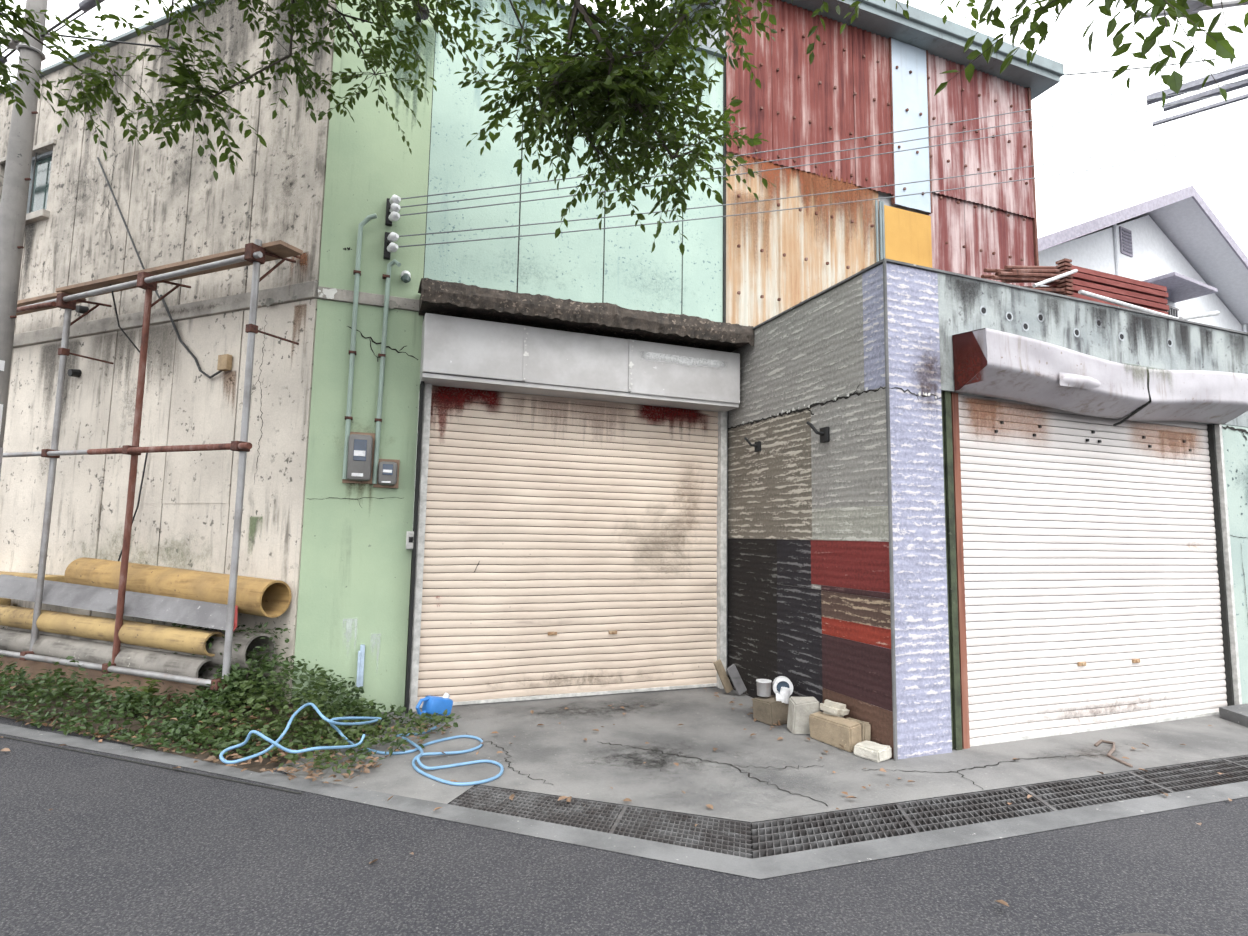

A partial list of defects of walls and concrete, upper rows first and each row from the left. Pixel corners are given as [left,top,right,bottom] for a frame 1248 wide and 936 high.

rust [735,155,872,257]
damp [1130,314,1212,355]
damp [42,341,77,409]
rust [431,385,500,433]
rust [640,405,707,429]
crack [466,734,551,784]
crack [600,742,827,806]